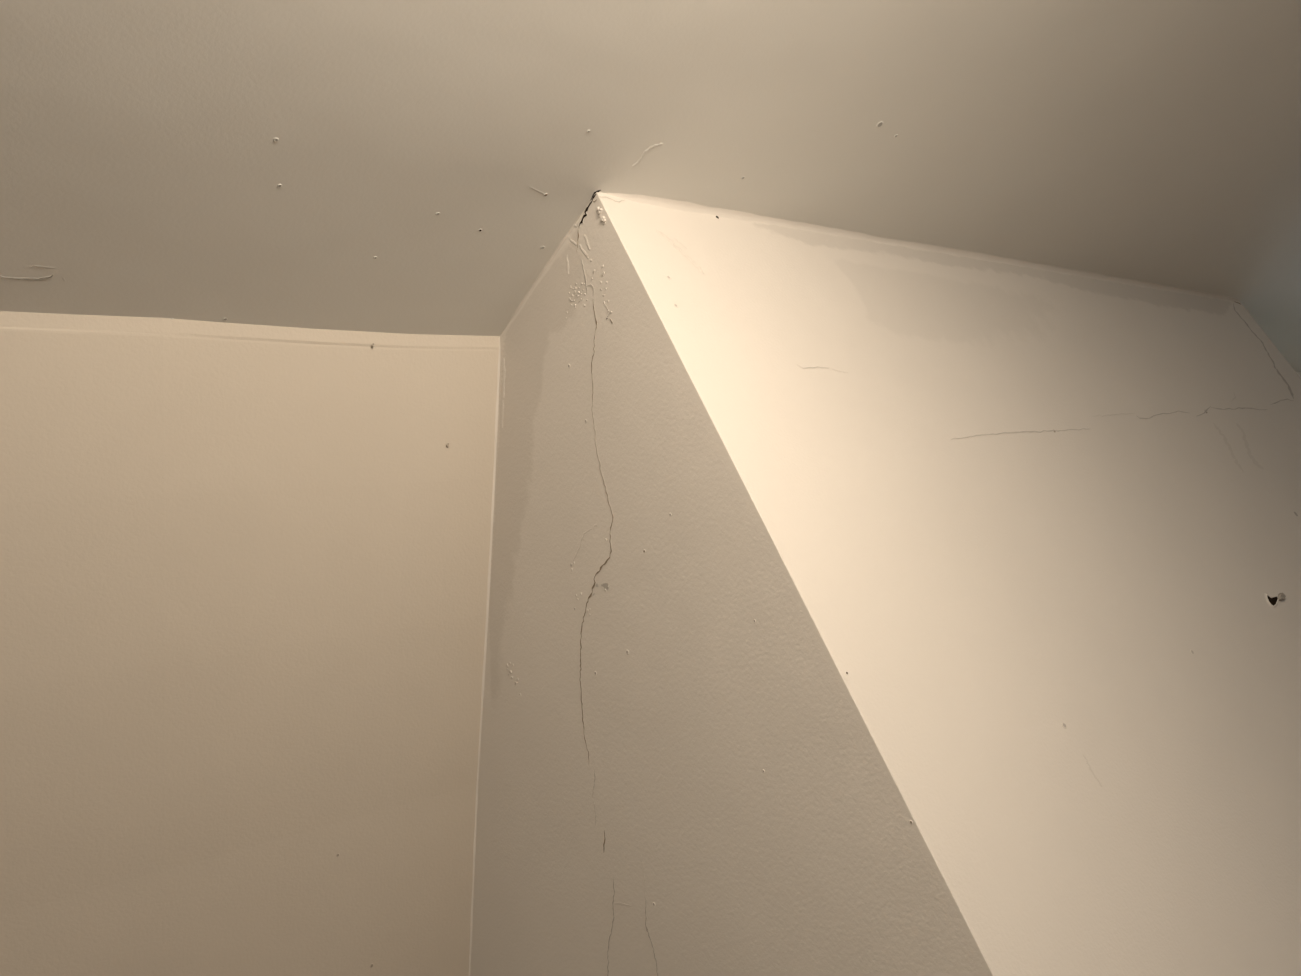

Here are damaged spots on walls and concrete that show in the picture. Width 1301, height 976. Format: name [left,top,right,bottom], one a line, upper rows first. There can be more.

crack [576,189,659,976]
crack [951,301,1294,440]